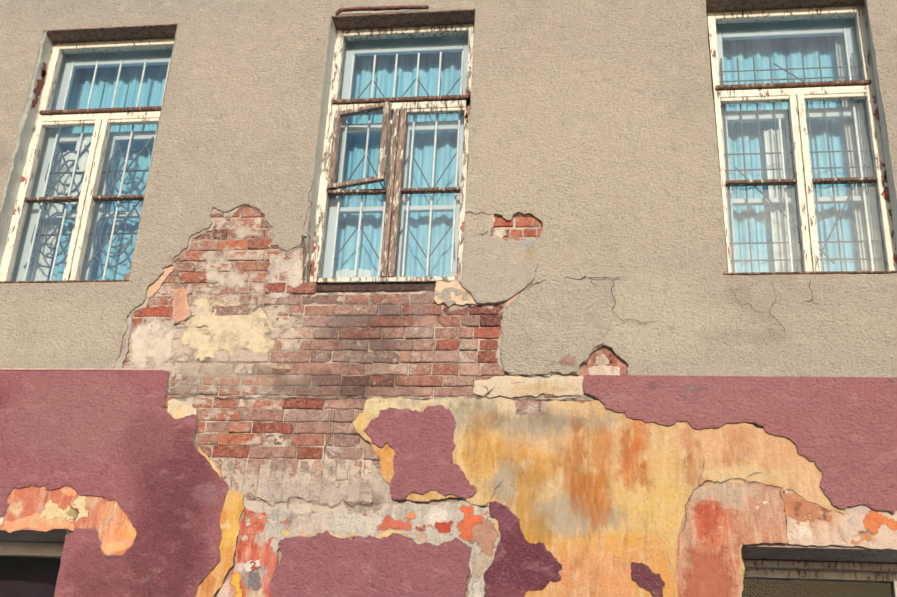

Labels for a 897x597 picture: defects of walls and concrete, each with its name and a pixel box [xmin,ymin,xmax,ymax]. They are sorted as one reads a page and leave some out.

peeling [880,161,893,221]
crack [525,275,654,323]
flaking render [115,204,897,597]
flaking render [0,485,137,556]